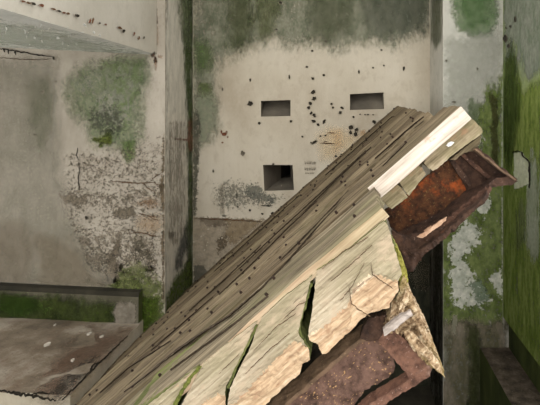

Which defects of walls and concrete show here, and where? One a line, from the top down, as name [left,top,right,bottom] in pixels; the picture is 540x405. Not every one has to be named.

crack [1,48,53,60]
leakage [503,0,540,173]
leakage [0,61,119,288]
peeling [60,134,165,300]
leakage [123,141,135,162]
corrosion [174,119,193,152]
spalling [512,151,530,189]
leakage [517,149,540,262]
leakage [407,241,509,405]
crack [0,336,128,401]
leakage [372,358,405,386]